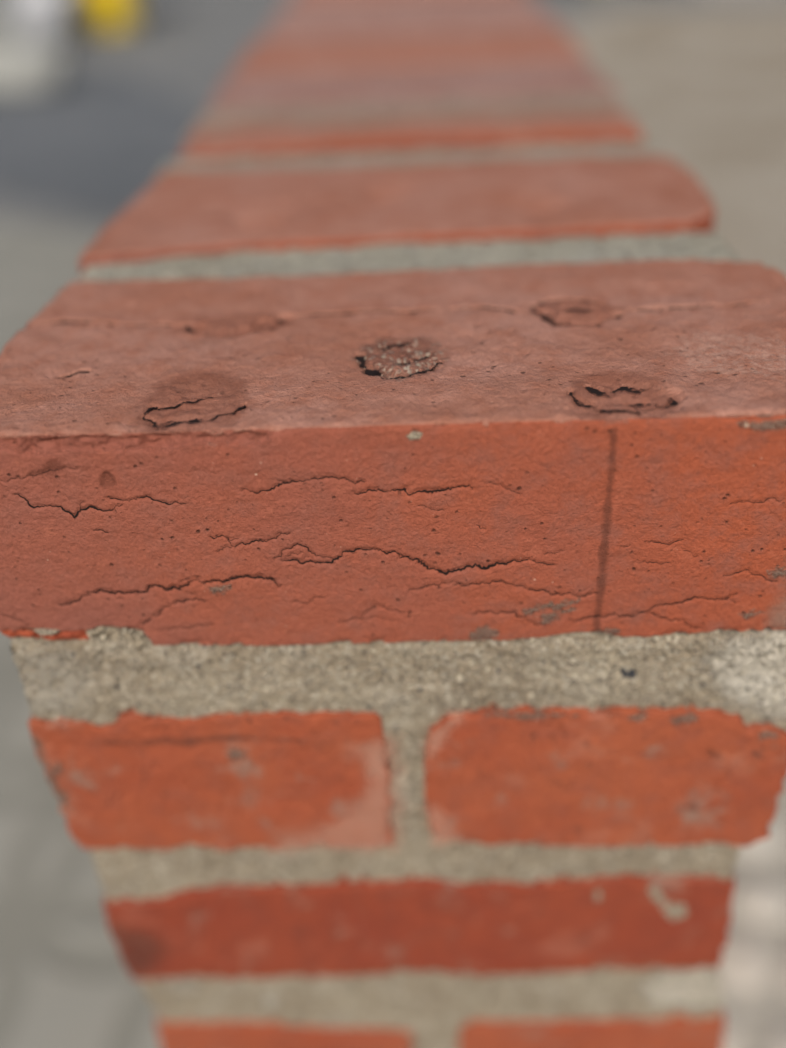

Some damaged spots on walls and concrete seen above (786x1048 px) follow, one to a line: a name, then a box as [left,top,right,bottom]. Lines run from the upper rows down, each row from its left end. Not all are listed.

crack [5,467,184,533]
crack [242,476,521,511]
crack [58,533,777,632]